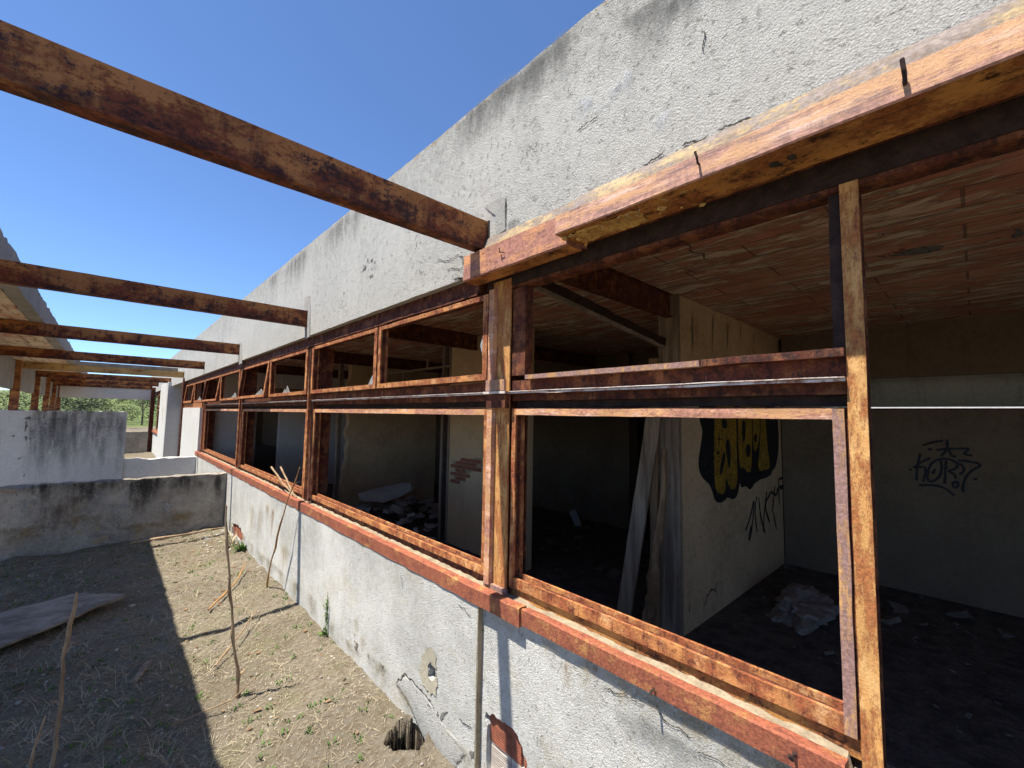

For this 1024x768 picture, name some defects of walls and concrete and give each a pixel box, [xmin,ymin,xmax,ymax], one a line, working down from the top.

peeling [560,198,668,246]
water stain [30,411,123,448]
water stain [130,478,160,502]
flaking render [450,457,482,484]
spalling [419,647,438,697]
crack [395,673,436,714]
flaking render [489,714,527,768]